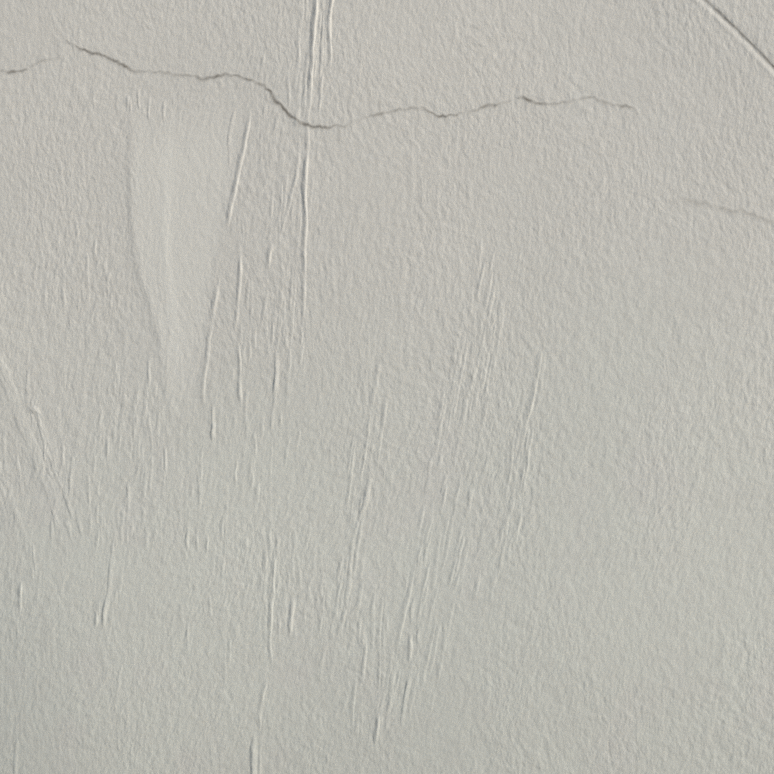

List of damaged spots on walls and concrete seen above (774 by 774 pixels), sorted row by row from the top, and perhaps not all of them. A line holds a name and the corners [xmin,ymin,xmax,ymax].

crack [0,38,641,142]